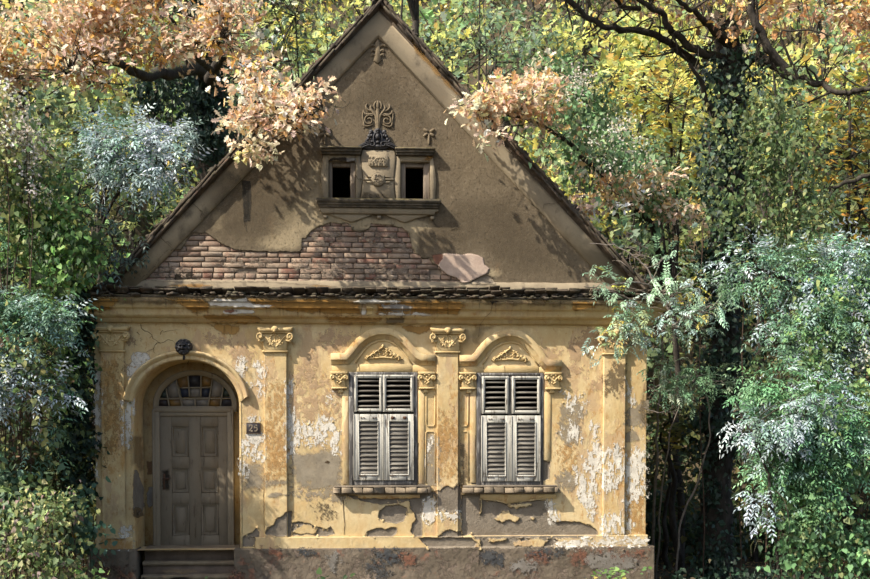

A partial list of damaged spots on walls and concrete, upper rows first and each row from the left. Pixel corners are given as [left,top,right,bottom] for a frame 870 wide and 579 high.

flaking render [145,223,495,286]
peeling [208,298,271,314]
spalling [354,299,430,316]
peeling [127,352,150,380]
peeling [235,355,268,398]
peeling [119,399,136,449]
peeling [238,414,267,478]
peeling [283,379,342,463]
spalling [346,385,650,579]